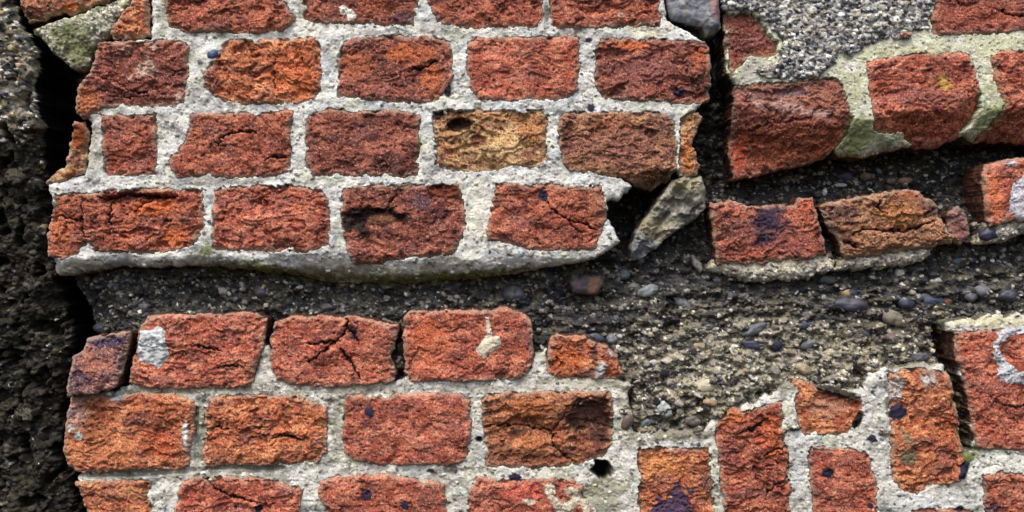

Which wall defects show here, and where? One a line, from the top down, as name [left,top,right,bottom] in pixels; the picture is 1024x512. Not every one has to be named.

crack [548,202,594,231]
crack [308,319,361,379]
spalling [813,382,860,401]
spalling [570,398,610,447]